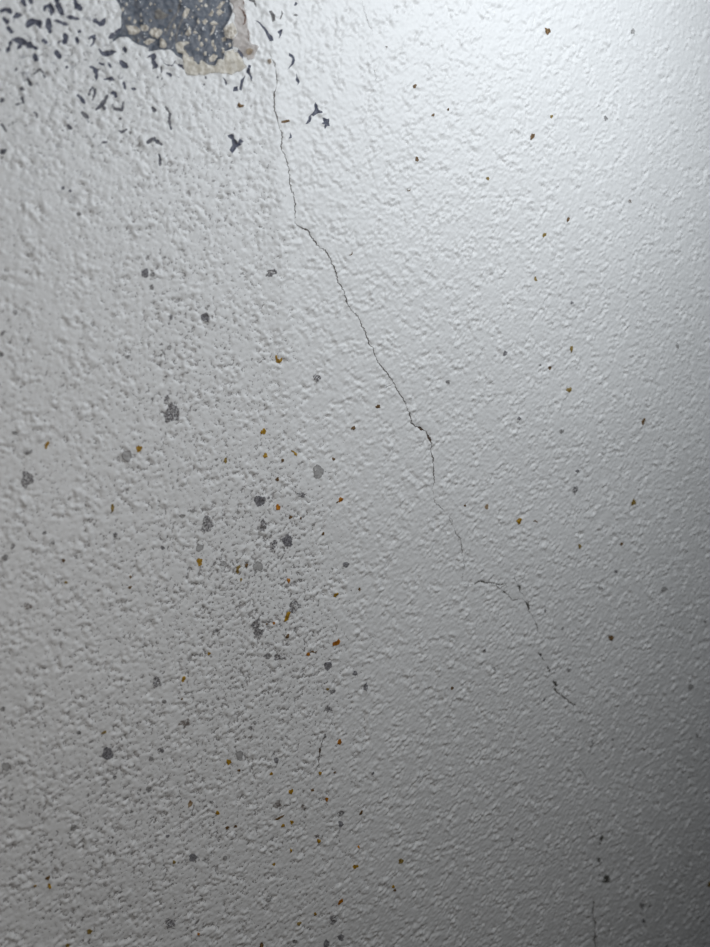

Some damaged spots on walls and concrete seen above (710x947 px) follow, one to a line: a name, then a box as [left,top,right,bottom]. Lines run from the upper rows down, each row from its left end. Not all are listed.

peeling [0,0,297,133]
crack [270,54,441,508]
crack [455,532,537,625]